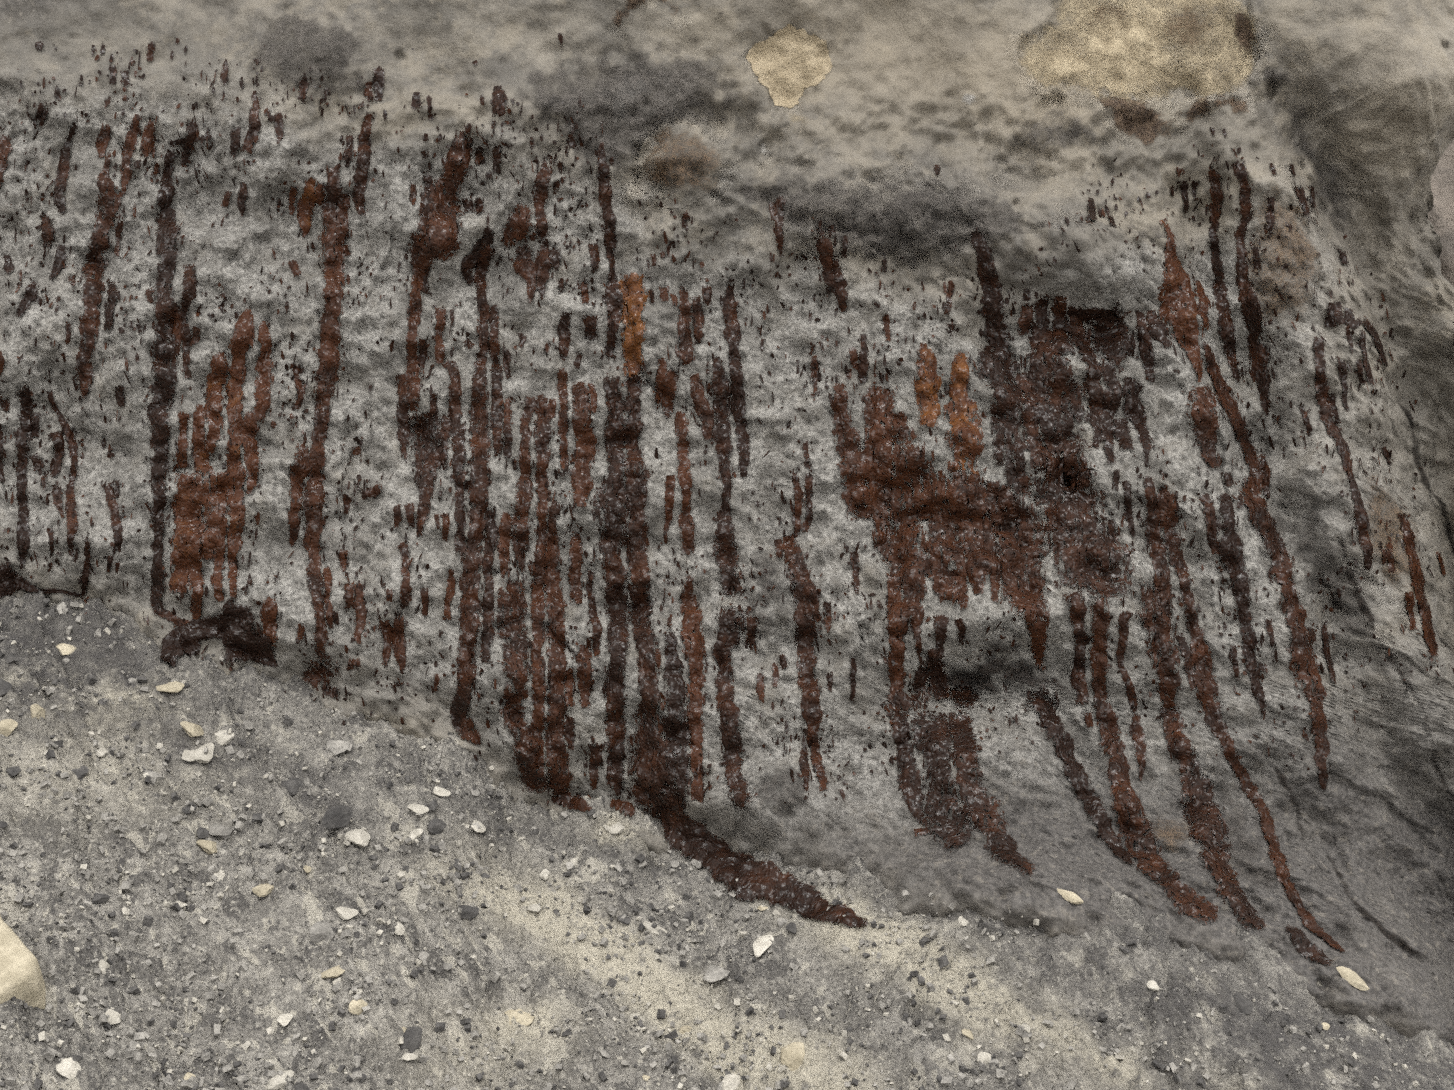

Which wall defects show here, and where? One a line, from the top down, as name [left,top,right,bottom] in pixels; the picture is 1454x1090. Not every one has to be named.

damp [250,15,361,90]
damp [521,56,735,171]
spalling [746,24,833,108]
rust [1100,95,1171,145]
spalling [1022,0,1254,99]
rust [1186,95,1248,122]
damp [742,178,1021,269]
rust [0,38,868,928]
rust [755,127,1454,967]